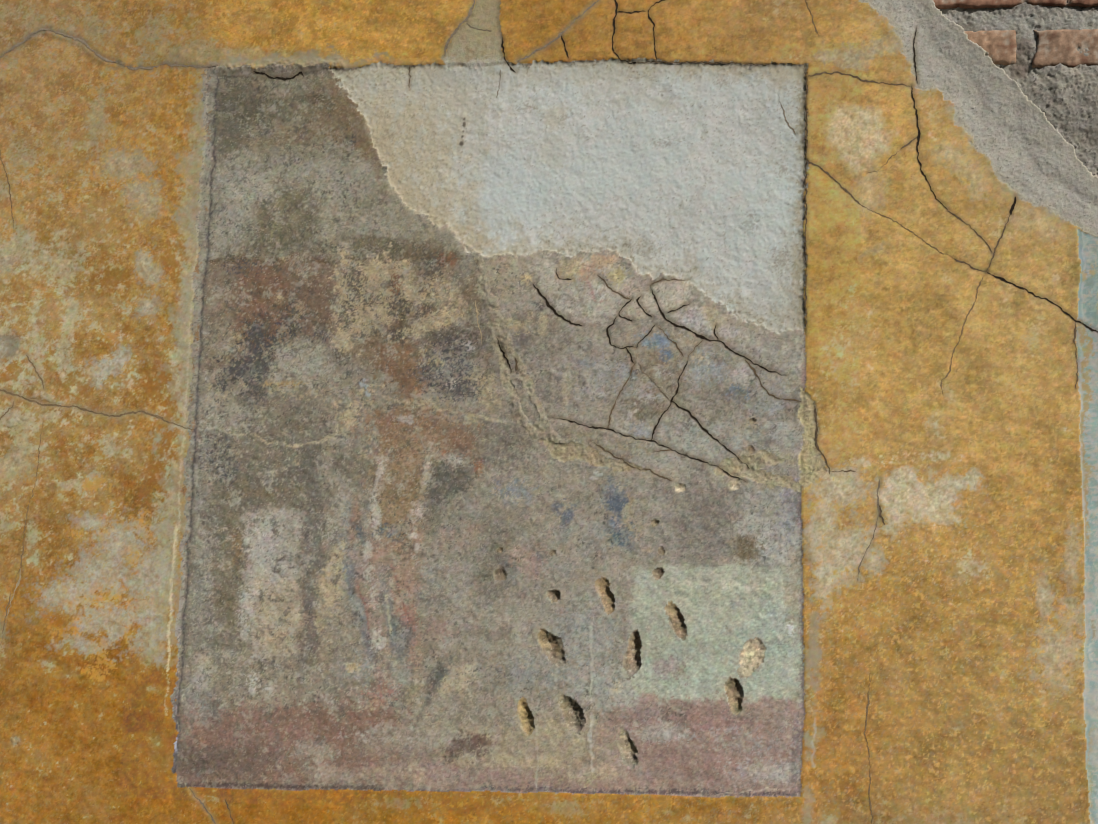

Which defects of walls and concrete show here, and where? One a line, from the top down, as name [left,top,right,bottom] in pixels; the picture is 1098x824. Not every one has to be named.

crack [0,28,218,70]
crack [444,0,771,98]
crack [0,151,14,230]
crack [779,27,1098,396]
flaking render [330,57,810,481]
crack [475,300,518,370]
crack [533,269,885,581]
crack [0,355,190,643]
spalling [547,589,561,603]
spalling [652,546,665,580]